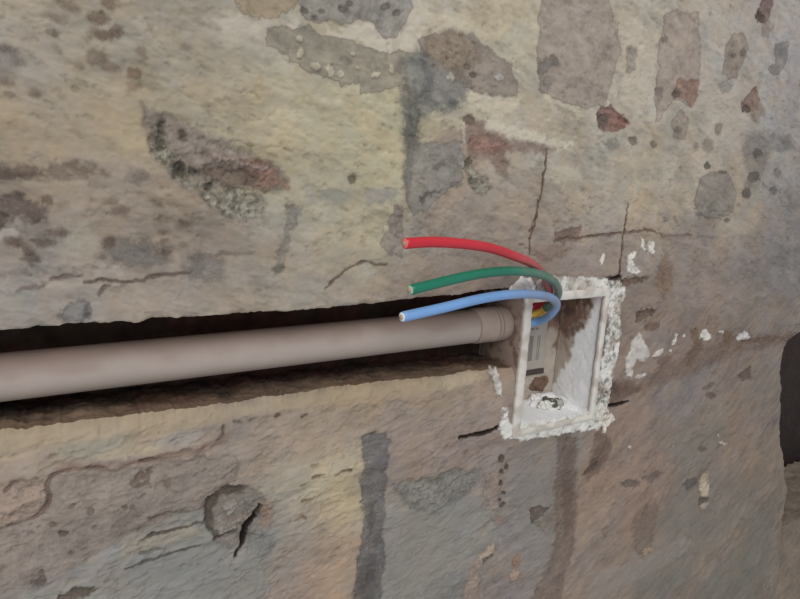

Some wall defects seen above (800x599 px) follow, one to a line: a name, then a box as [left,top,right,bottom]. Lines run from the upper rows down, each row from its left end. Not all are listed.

flaking render [235,0,518,96]
damp [400,49,466,195]
flaking render [537,0,637,132]
flaking render [654,9,701,139]
damp [0,192,64,229]
damp [5,230,63,263]
crack [17,272,190,296]
crack [529,150,547,254]
crack [554,203,707,281]
flaking render [694,162,737,222]
flaking render [0,455,274,590]
damp [353,432,391,599]